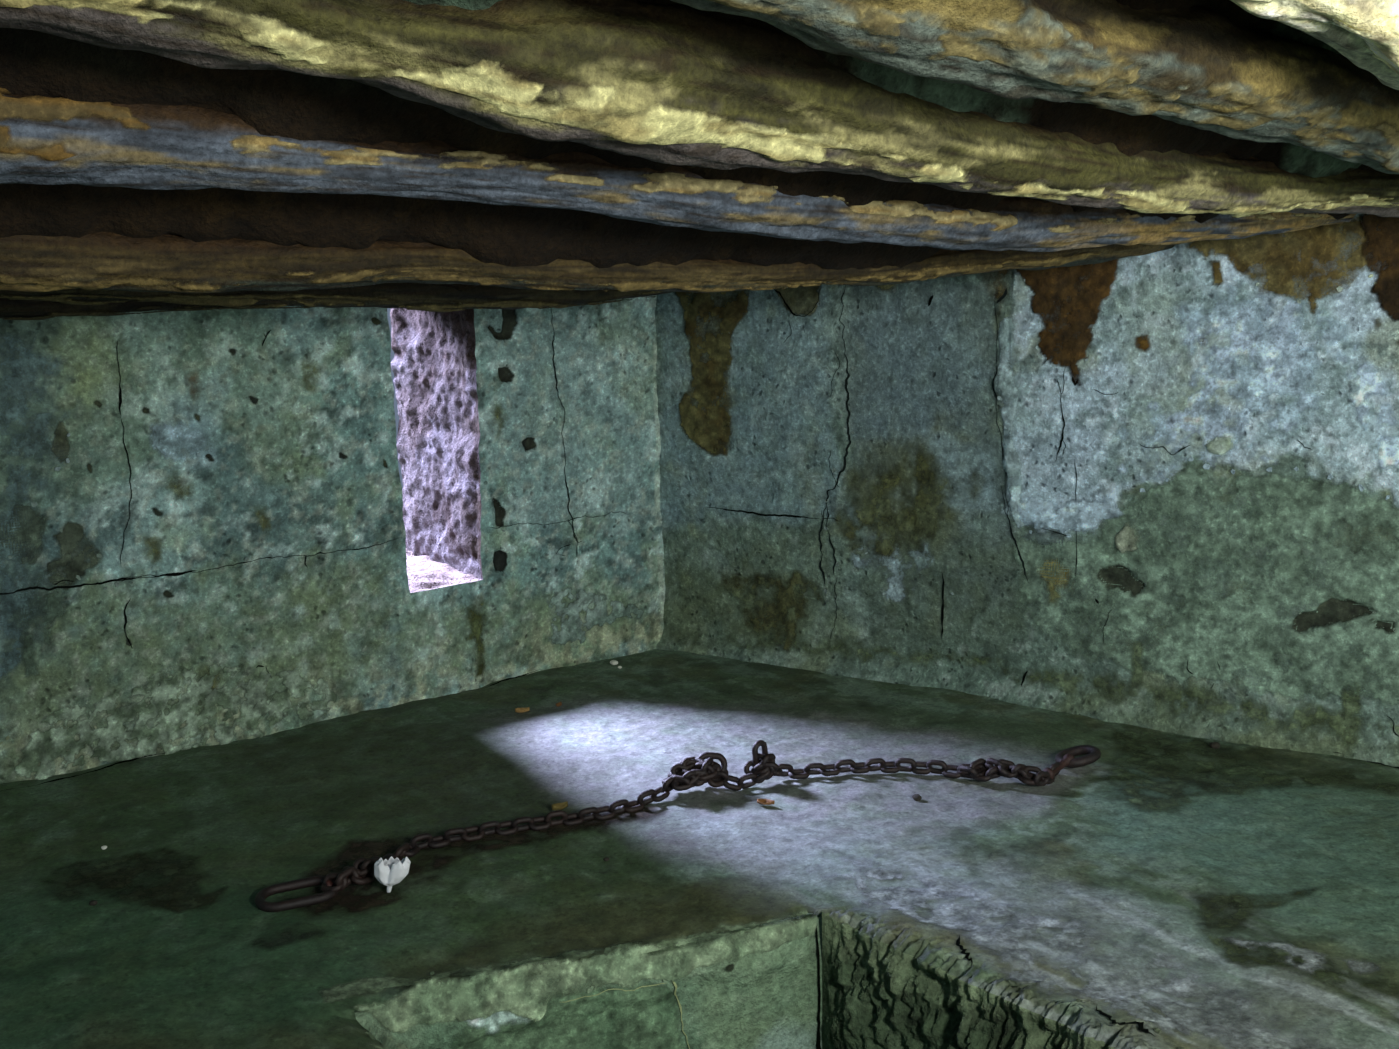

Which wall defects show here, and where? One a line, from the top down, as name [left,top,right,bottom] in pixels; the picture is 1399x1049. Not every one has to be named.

rust [675,290,749,455]
rust [1016,259,1119,386]
rust [1361,214,1399,327]
crack [0,341,395,649]
crack [709,285,855,634]
water stain [836,454,951,556]
peeling [996,317,1399,706]
crack [1335,700,1399,768]
water stain [49,849,226,913]